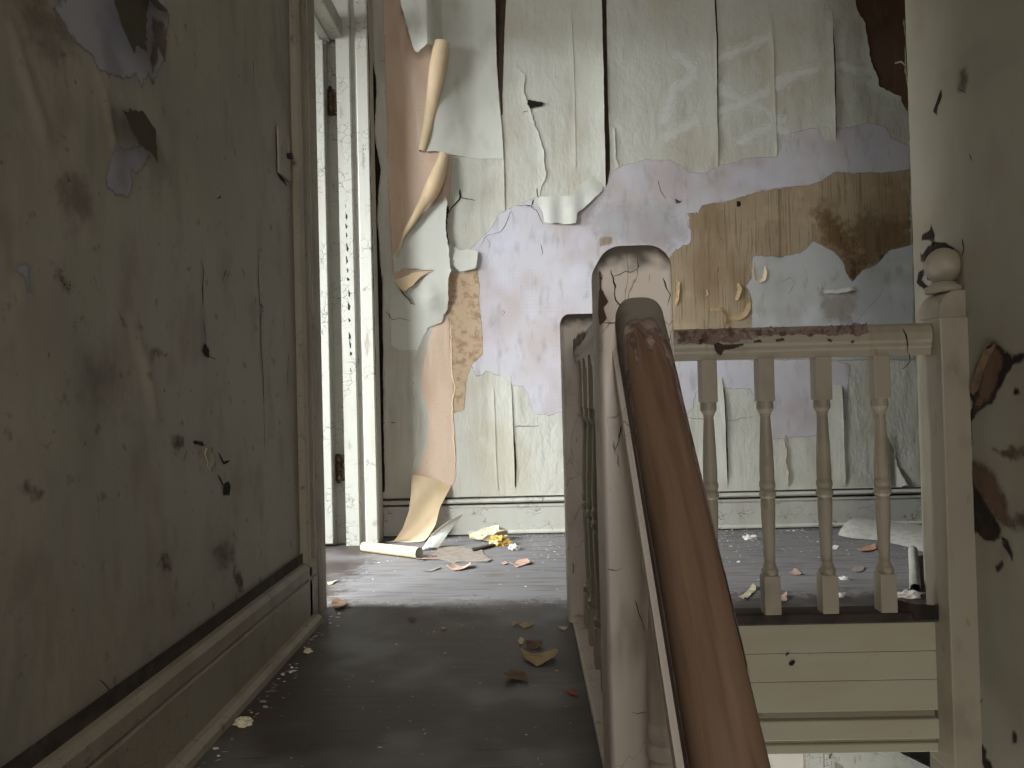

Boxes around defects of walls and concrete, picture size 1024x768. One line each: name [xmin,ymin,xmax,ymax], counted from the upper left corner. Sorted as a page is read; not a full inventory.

peeling [55,0,169,87]
peeling [856,0,909,111]
peeling [106,108,158,197]
crack [482,67,546,247]
crack [609,126,619,168]
peeling [446,123,910,473]
damp [669,170,910,330]
peeling [677,207,954,345]
spalling [970,343,1024,420]
spalling [193,440,231,496]
peeling [360,474,462,558]
spalling [972,462,1013,572]